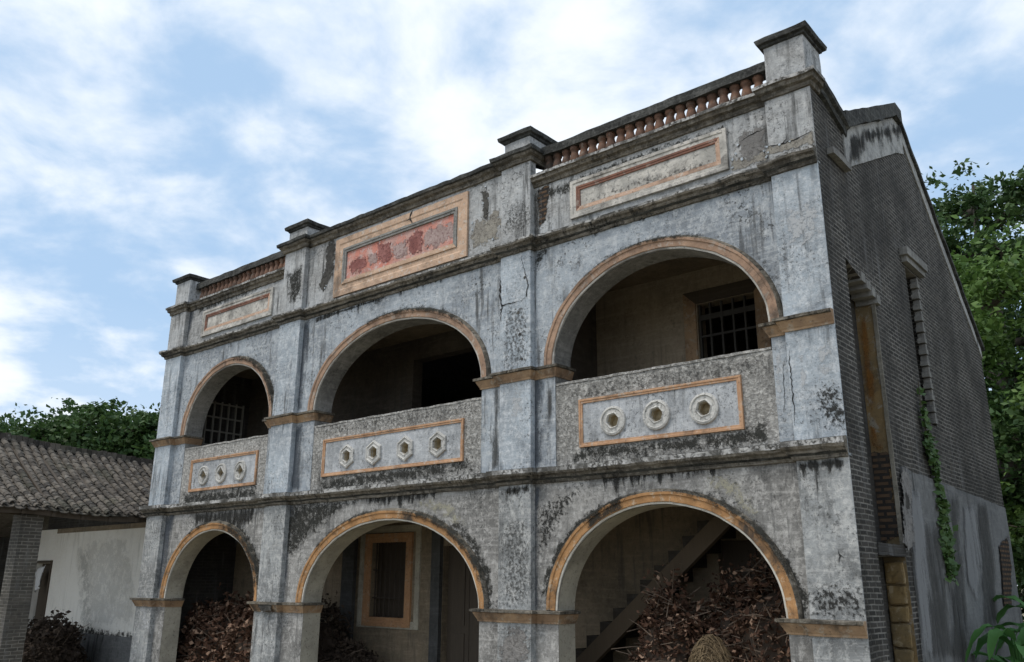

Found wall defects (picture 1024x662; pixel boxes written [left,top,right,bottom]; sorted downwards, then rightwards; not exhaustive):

peeling [734,127,766,161]
water stain [850,124,902,162]
flaking render [537,185,549,227]
water stain [275,265,310,304]
water stain [187,286,262,338]
crack [499,259,529,361]
crack [783,351,795,424]
water stain [573,420,767,463]
mould [319,457,474,489]
water stain [799,458,843,488]
water stain [285,493,492,606]
water stain [501,469,808,615]